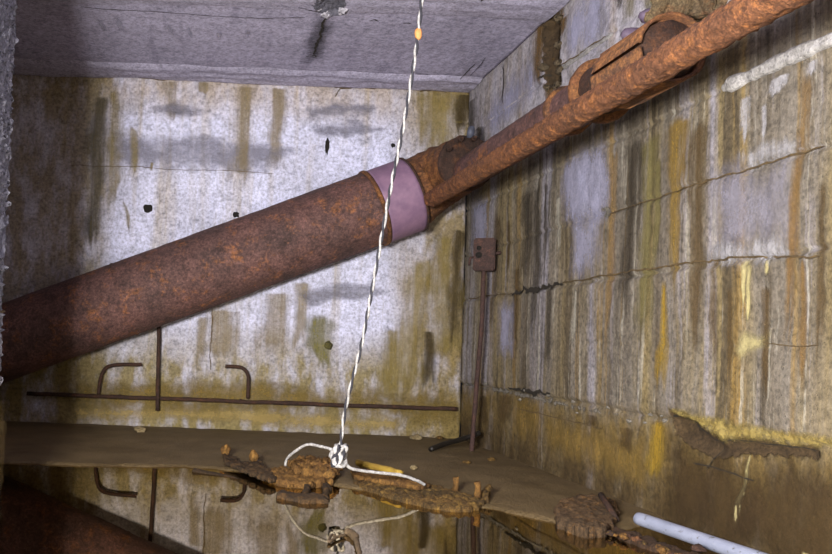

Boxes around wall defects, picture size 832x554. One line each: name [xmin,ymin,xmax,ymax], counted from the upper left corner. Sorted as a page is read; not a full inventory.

spalling [312,0,349,19]
spalling [529,0,599,92]
damp [86,98,107,244]
damp [622,140,661,317]
crack [469,255,818,299]
damp [689,126,789,344]
damp [423,332,434,381]
rust [655,286,666,381]
damp [728,289,769,385]
rust [647,423,663,472]
spalling [643,409,820,460]
damp [672,409,832,446]